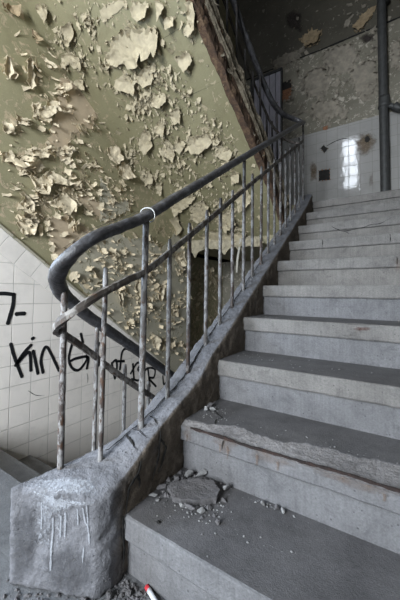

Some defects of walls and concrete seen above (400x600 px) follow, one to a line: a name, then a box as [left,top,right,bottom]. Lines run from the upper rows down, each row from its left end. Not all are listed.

peeling [0,0,239,260]
spalling [204,0,289,215]
peeling [271,28,322,118]
peeling [319,0,378,102]
leakage [357,135,373,152]
peeling [69,170,265,372]
corrosion [190,427,400,493]